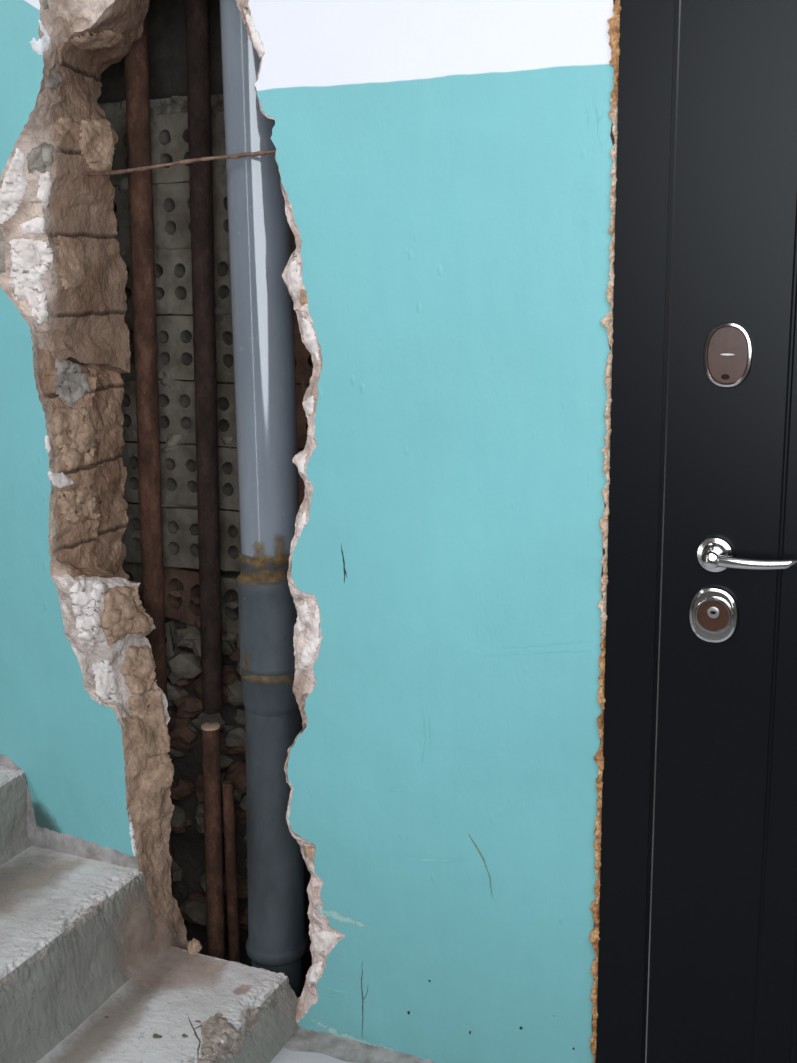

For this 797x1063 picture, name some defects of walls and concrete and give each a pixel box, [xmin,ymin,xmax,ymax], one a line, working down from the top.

peeling [236,0,275,120]
flaking render [0,0,150,650]
rust [239,539,288,582]
flaking render [271,139,346,1022]
spalling [61,896,108,936]
flaking render [92,660,188,950]